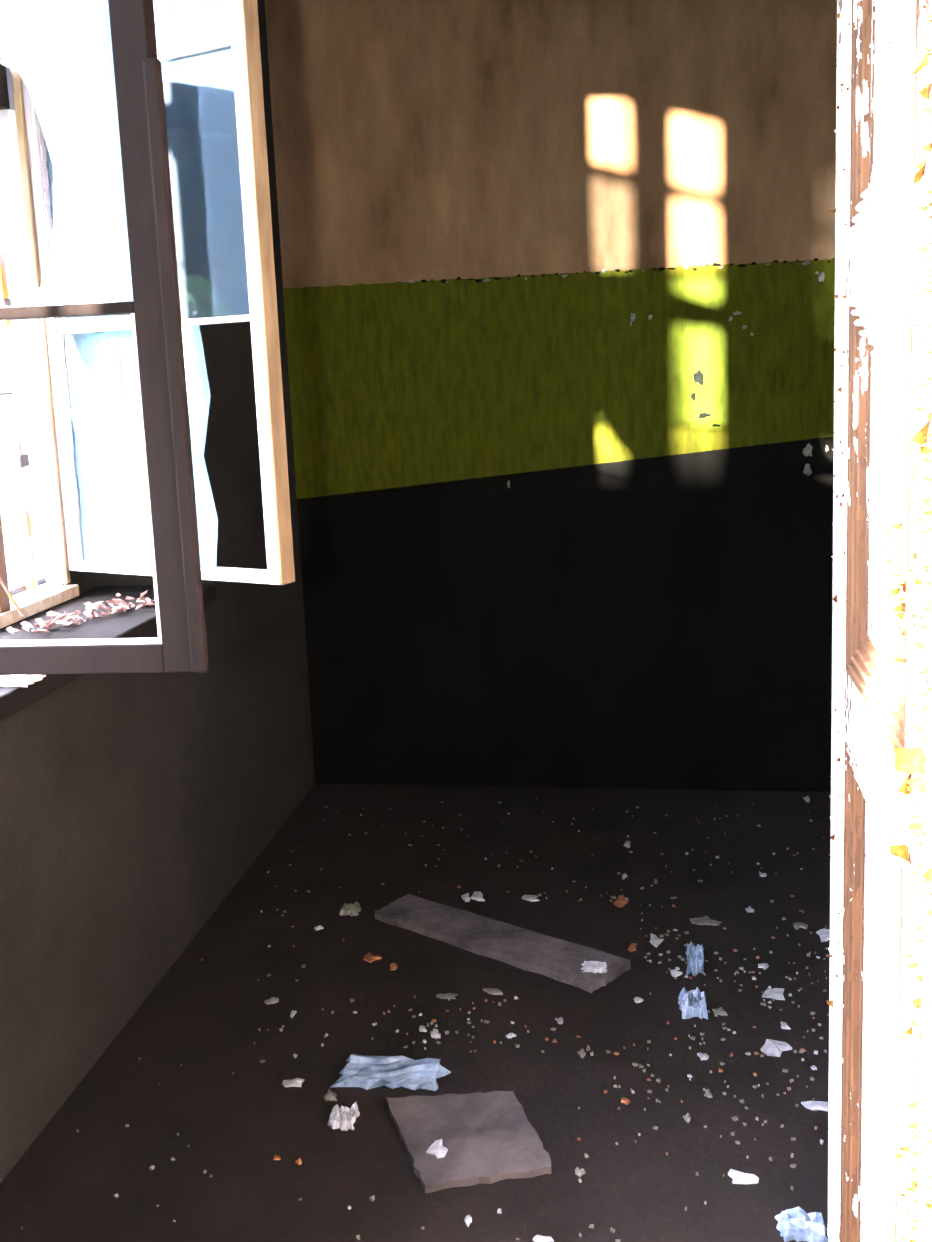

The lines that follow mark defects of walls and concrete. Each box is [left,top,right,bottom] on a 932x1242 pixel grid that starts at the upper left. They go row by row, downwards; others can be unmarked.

peeling [831,492,846,663]
peeling [883,5,932,1242]